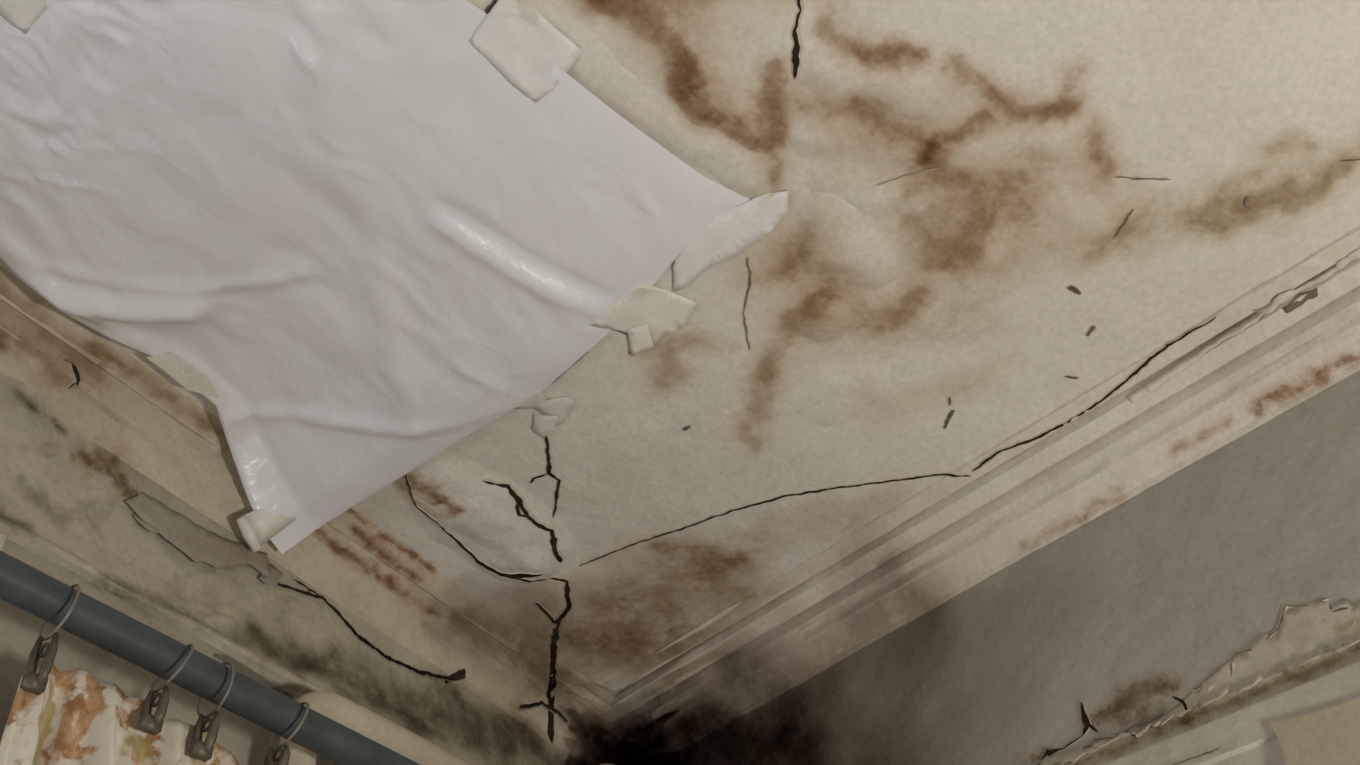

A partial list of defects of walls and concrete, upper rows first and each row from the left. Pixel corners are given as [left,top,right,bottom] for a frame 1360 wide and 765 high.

crack [1113,177,1171,239]
crack [743,257,751,351]
crack [405,316,1217,744]
crack [272,579,452,683]
damp [376,692,512,753]
damp [568,706,815,765]
peeling [1040,598,1360,765]